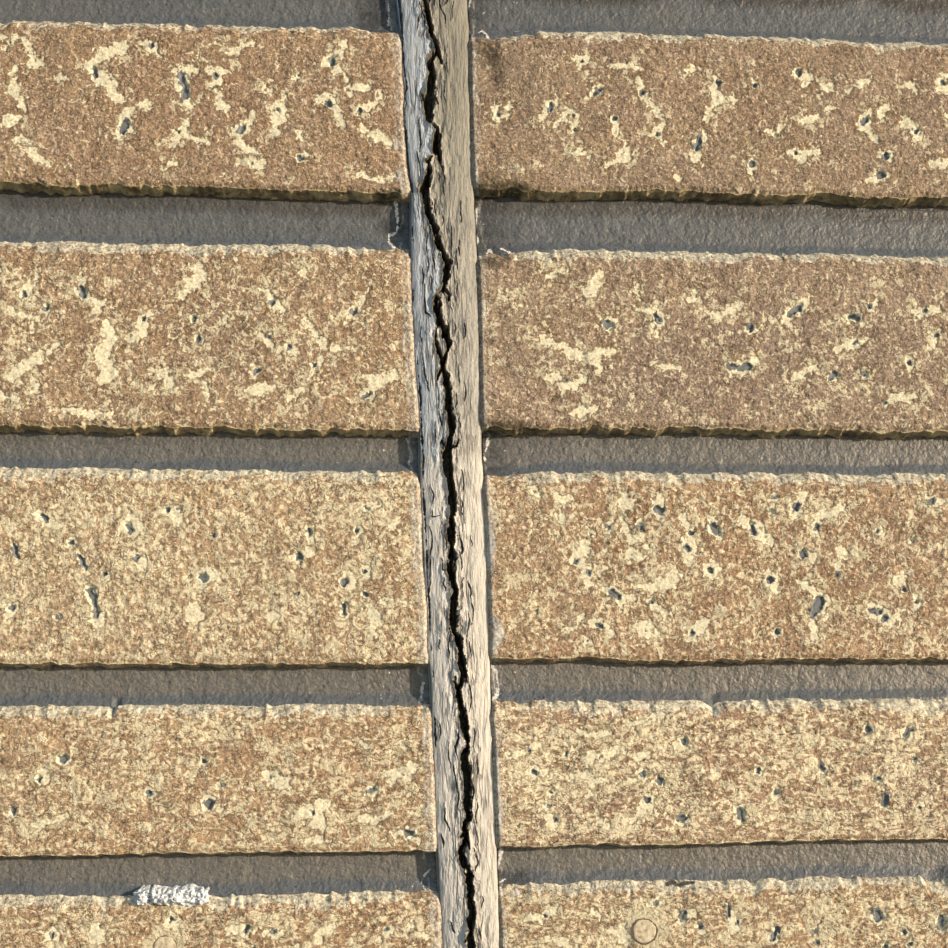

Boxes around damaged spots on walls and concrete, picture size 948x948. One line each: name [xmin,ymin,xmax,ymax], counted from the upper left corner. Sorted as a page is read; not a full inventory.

crack [397,0,494,948]